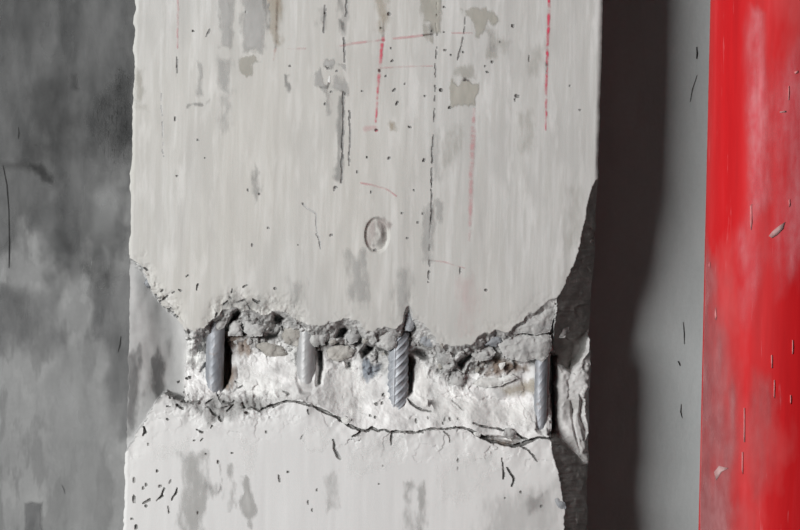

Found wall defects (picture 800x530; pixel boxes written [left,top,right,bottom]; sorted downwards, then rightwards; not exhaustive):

spalling [125,180,598,530]
crack [261,398,552,487]